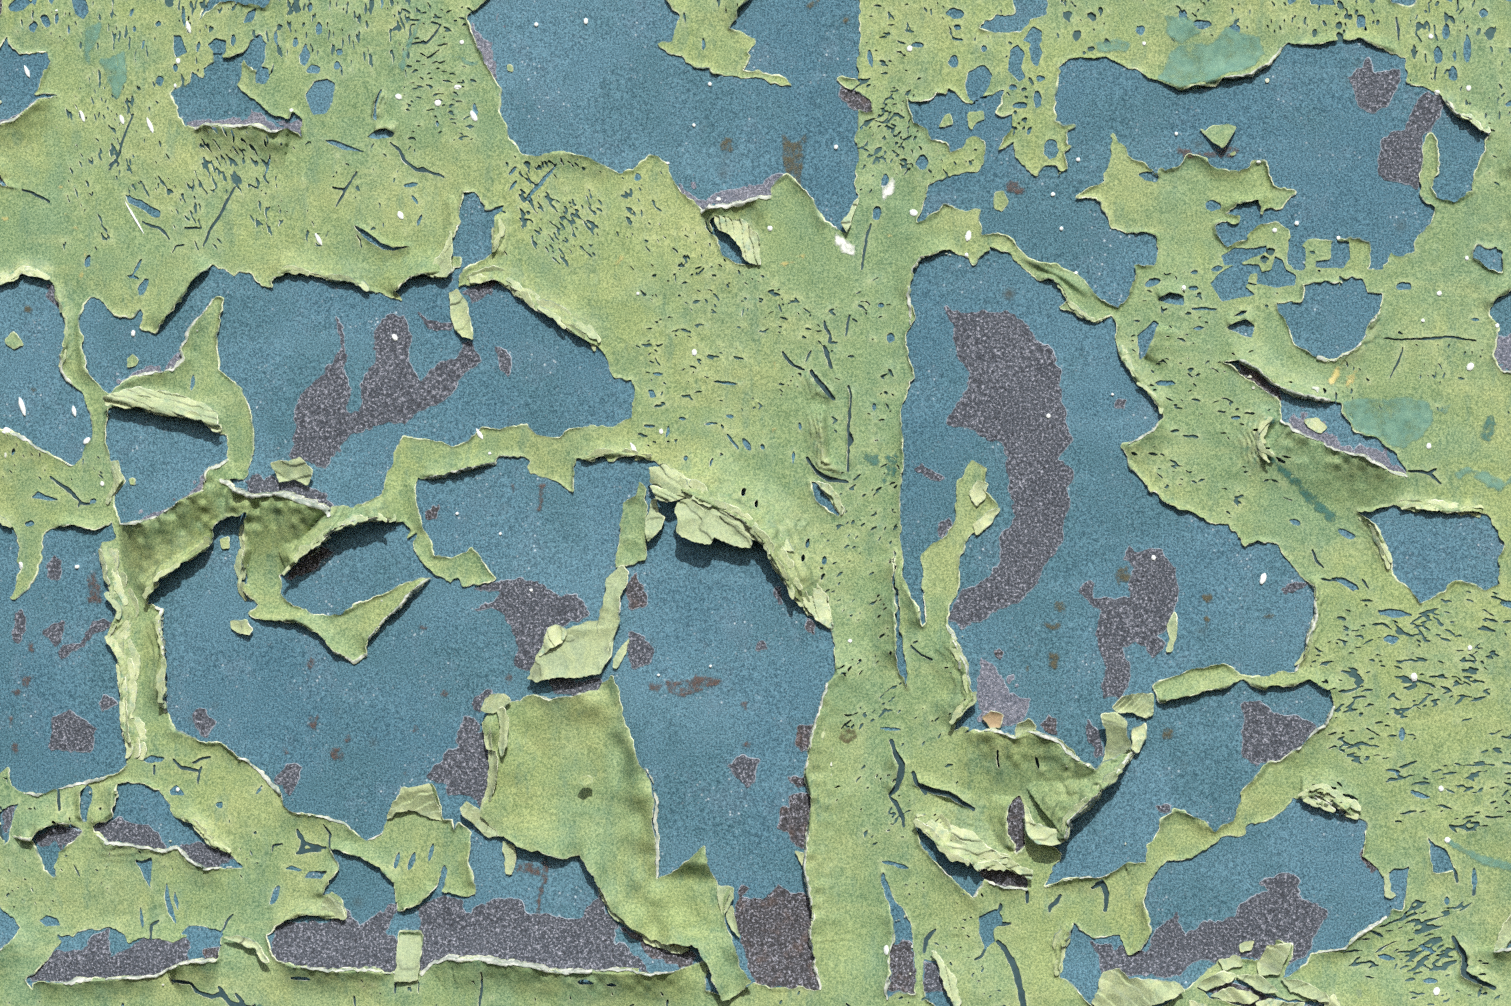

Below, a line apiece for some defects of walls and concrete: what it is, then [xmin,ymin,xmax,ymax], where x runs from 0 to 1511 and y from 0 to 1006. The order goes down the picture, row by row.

peeling [0,0,882,1006]
peeling [881,0,1511,1006]